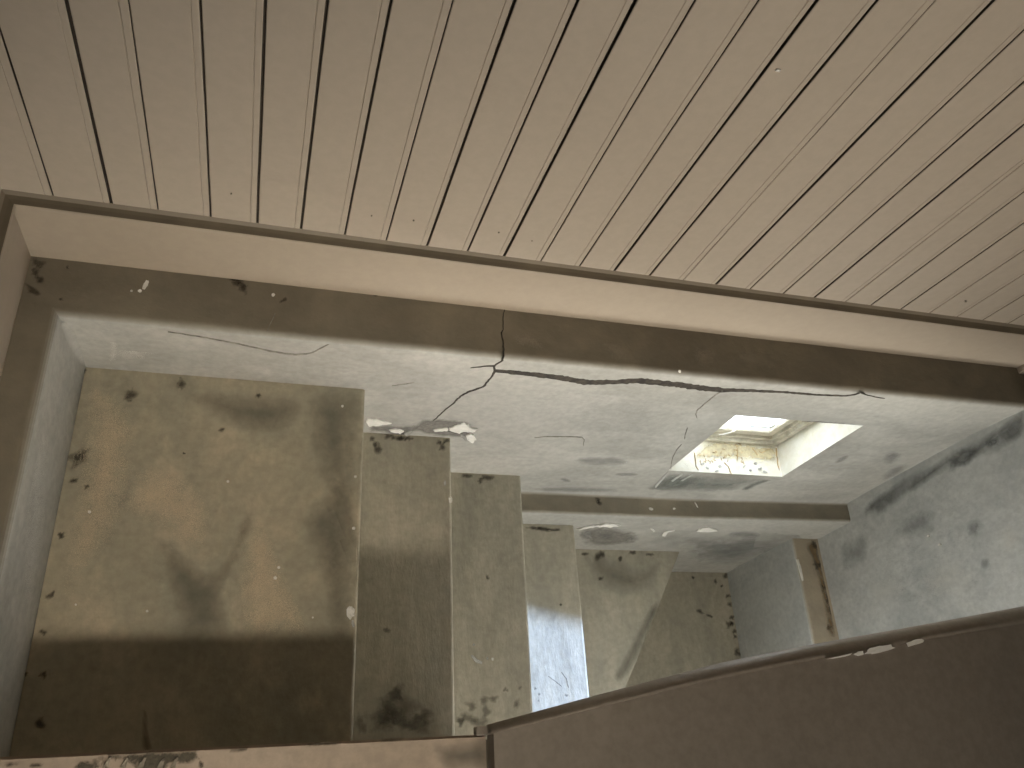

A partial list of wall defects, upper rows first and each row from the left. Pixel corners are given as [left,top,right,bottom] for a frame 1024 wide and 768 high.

crack [168,314,329,356]
crack [433,310,885,464]
spalling [366,418,478,443]
damp [952,418,1022,464]
peeling [576,522,632,544]
peeling [829,644,894,659]